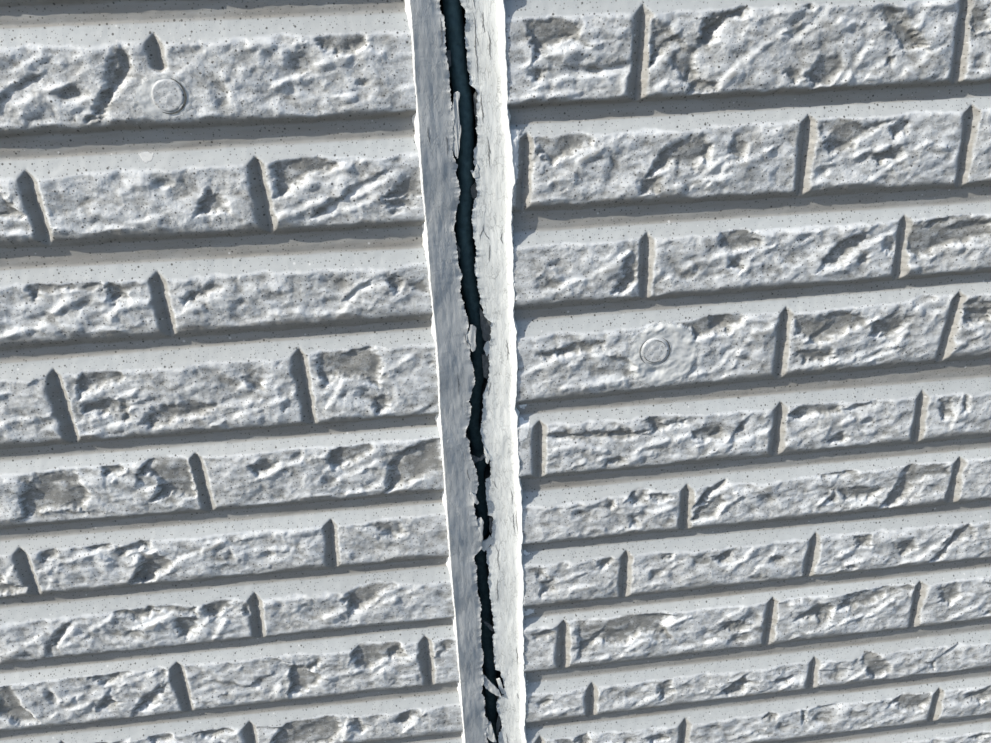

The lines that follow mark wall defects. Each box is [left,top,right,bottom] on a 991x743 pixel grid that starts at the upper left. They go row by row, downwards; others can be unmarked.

crack [428,0,519,743]